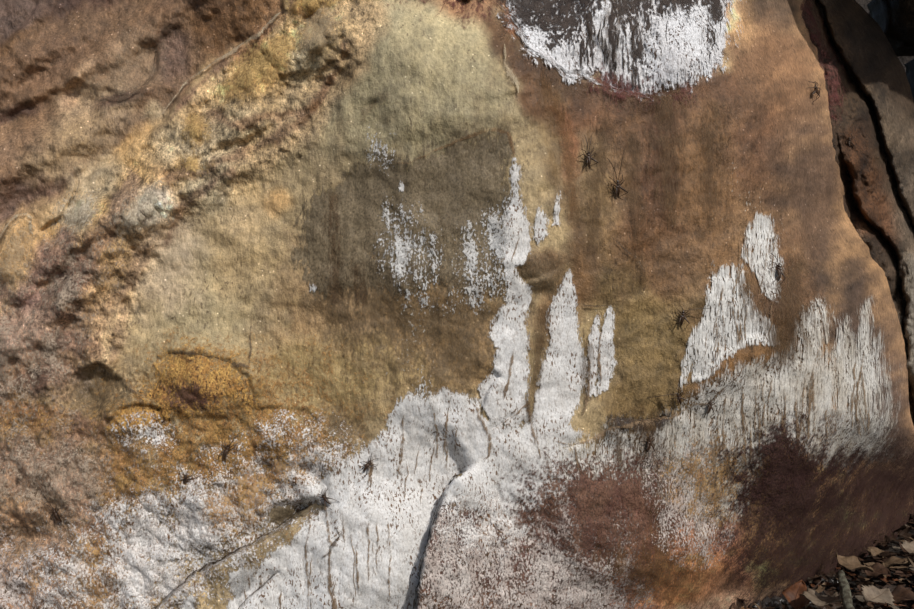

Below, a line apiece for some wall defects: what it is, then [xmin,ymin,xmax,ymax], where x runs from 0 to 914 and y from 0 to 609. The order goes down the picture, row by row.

crack [413,402,530,608]